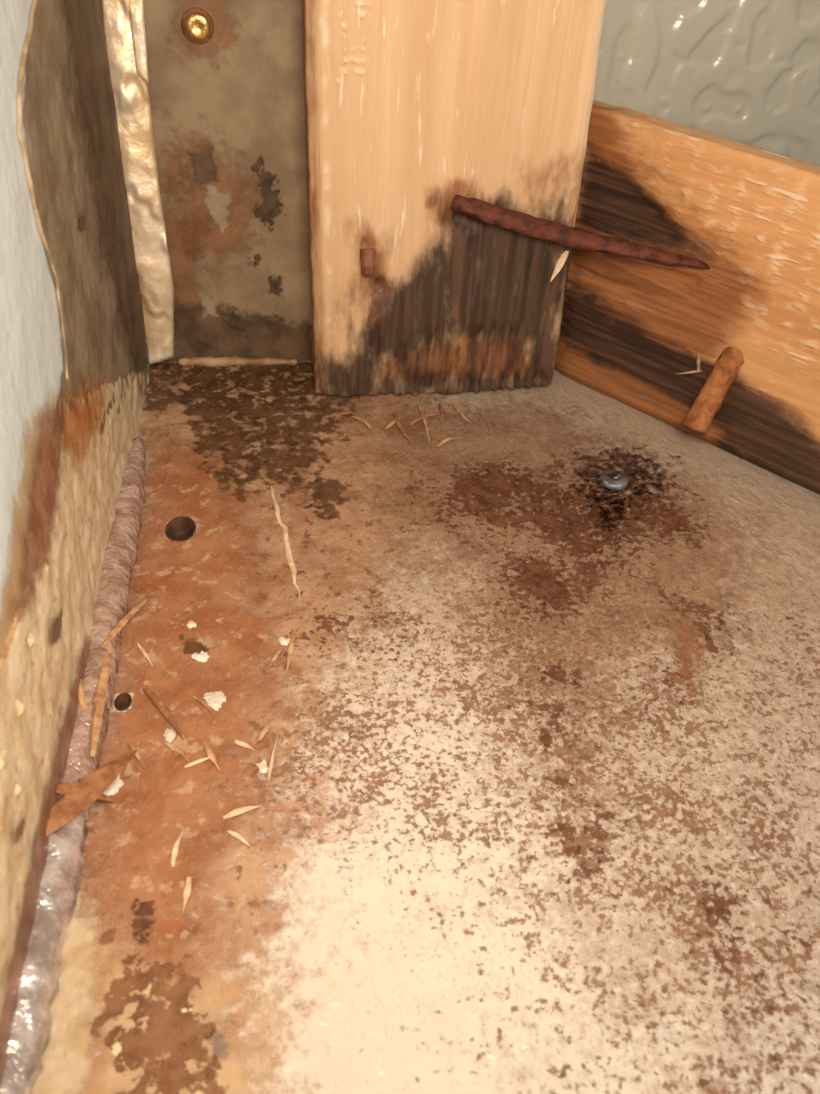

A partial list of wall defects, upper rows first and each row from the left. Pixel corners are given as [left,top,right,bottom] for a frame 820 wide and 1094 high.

corrosion [3,380,106,619]
peeling [0,363,150,1089]
peeling [32,893,225,1094]
leakage [17,0,472,1094]
corrosion [234,403,820,1094]